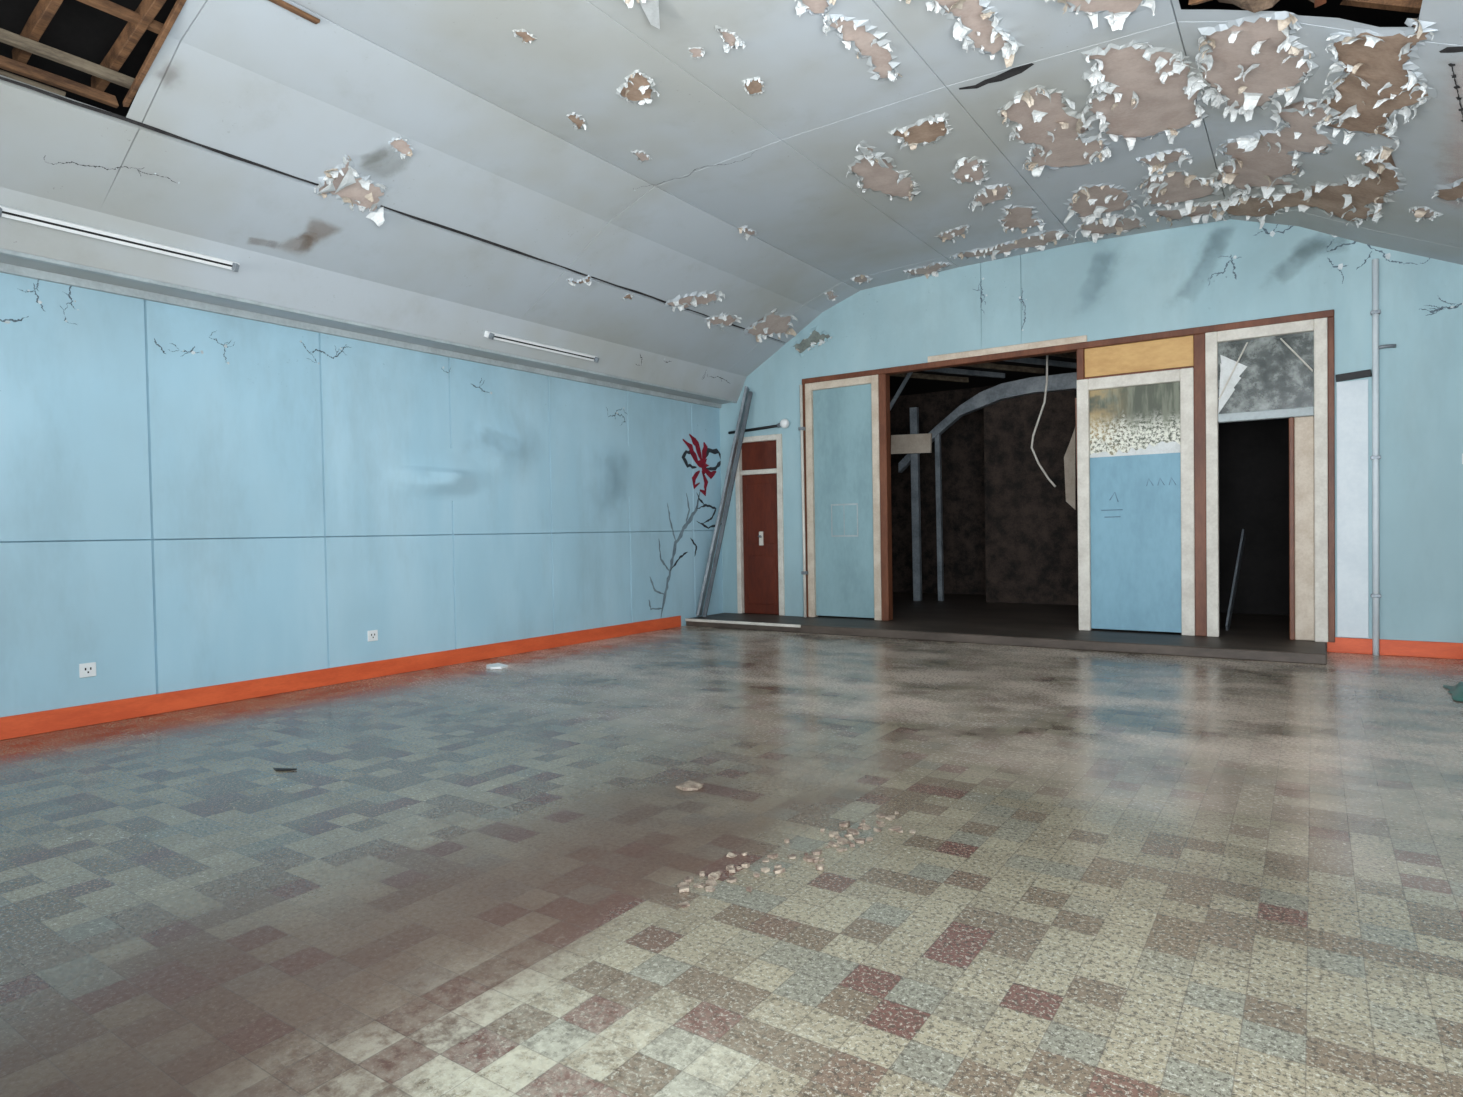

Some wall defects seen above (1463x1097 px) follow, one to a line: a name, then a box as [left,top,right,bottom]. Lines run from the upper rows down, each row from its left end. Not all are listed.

peeling [623,0,660,29]
peeling [795,0,902,82]
peeling [741,76,765,96]
peeling [388,136,413,159]
peeling [846,112,953,201]
peeling [899,0,1463,279]
peeling [314,154,387,226]
crack [0,281,79,324]
peeling [665,290,833,358]
crack [154,331,234,364]
crack [300,340,351,364]